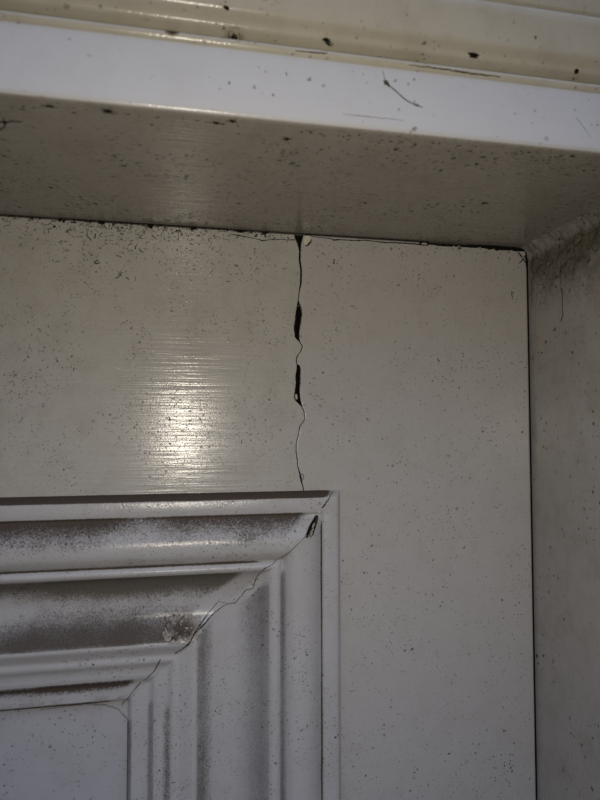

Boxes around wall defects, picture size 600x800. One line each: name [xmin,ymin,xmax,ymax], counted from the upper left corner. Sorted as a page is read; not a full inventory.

crack [0,214,527,490]
crack [40,492,333,767]